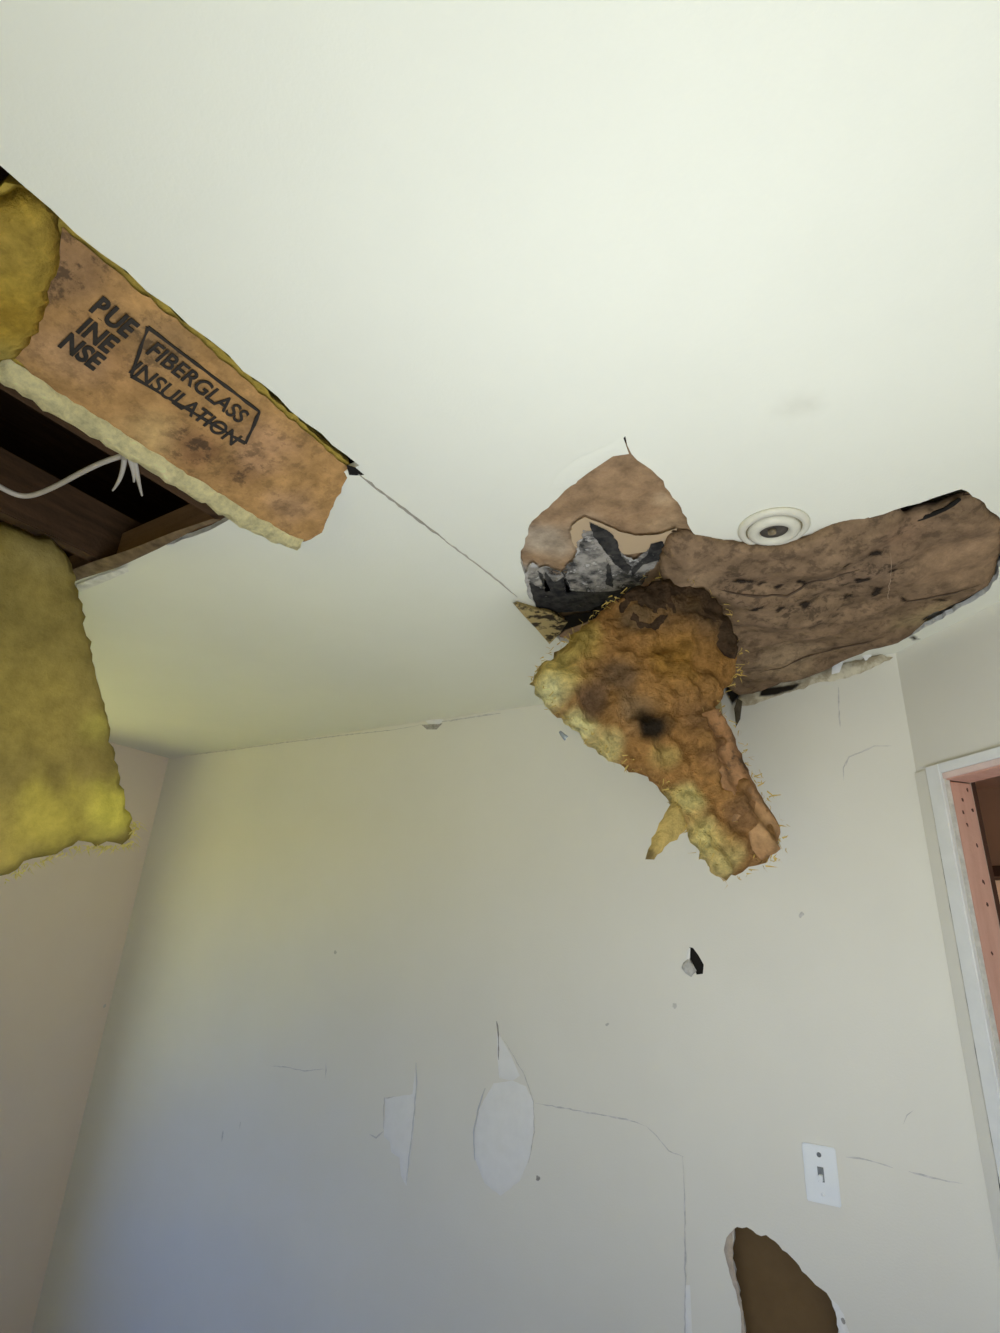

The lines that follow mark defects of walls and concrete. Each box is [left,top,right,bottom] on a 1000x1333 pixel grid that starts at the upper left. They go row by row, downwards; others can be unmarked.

peeling [513,436,691,644]
spalling [682,947,704,977]
peeling [473,1021,535,1196]
crack [537,1103,686,1333]
spalling [724,1231,745,1333]
spalling [831,1299,849,1333]